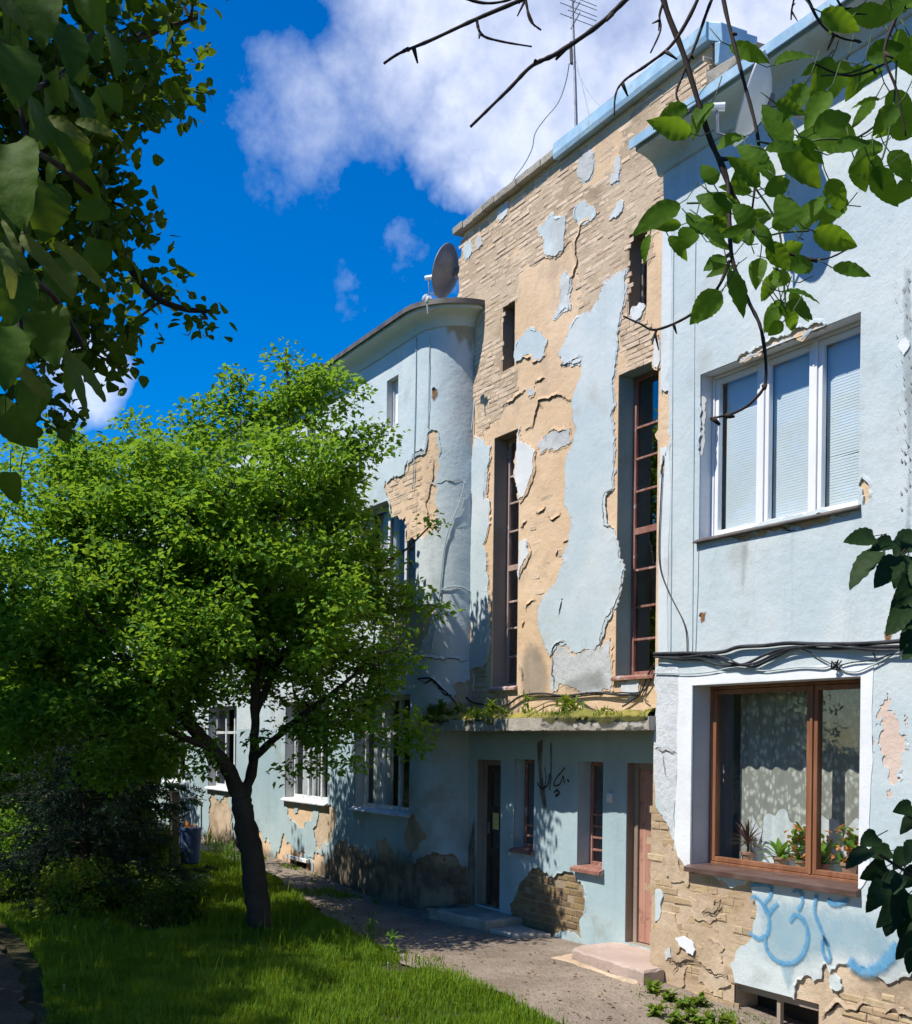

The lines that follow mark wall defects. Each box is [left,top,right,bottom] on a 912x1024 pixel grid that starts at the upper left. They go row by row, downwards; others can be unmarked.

crack [569,212,600,279]
spalling [738,318,828,364]
spalling [432,55,710,716]
spalling [384,430,442,543]
peeling [873,693,910,799]
spalling [208,792,232,837]
spalling [259,797,367,872]
spalling [404,815,467,905]
spalling [510,867,587,938]
spalling [644,803,757,1009]
spalling [792,962,912,1024]